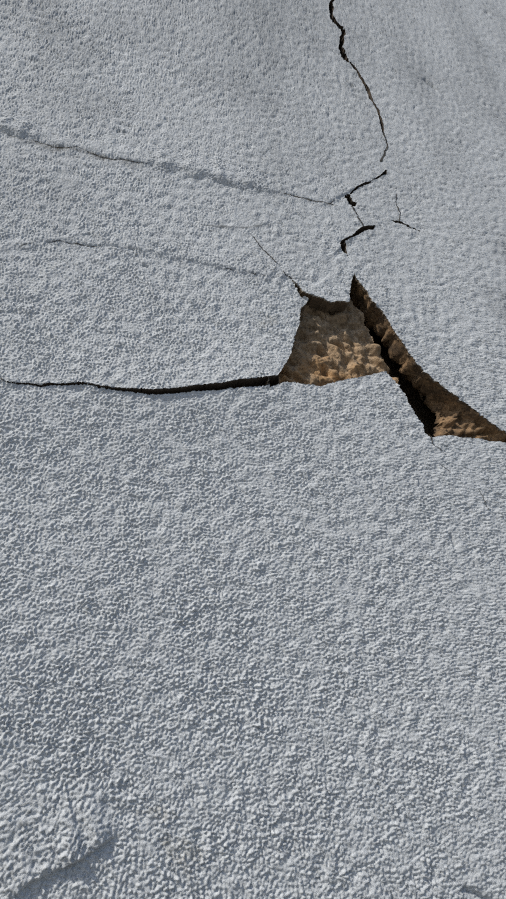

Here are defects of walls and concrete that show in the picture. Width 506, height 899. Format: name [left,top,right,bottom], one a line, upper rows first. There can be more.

crack [34,140,147,164]
crack [281,0,420,256]
crack [0,376,280,395]
flaking render [264,274,506,443]